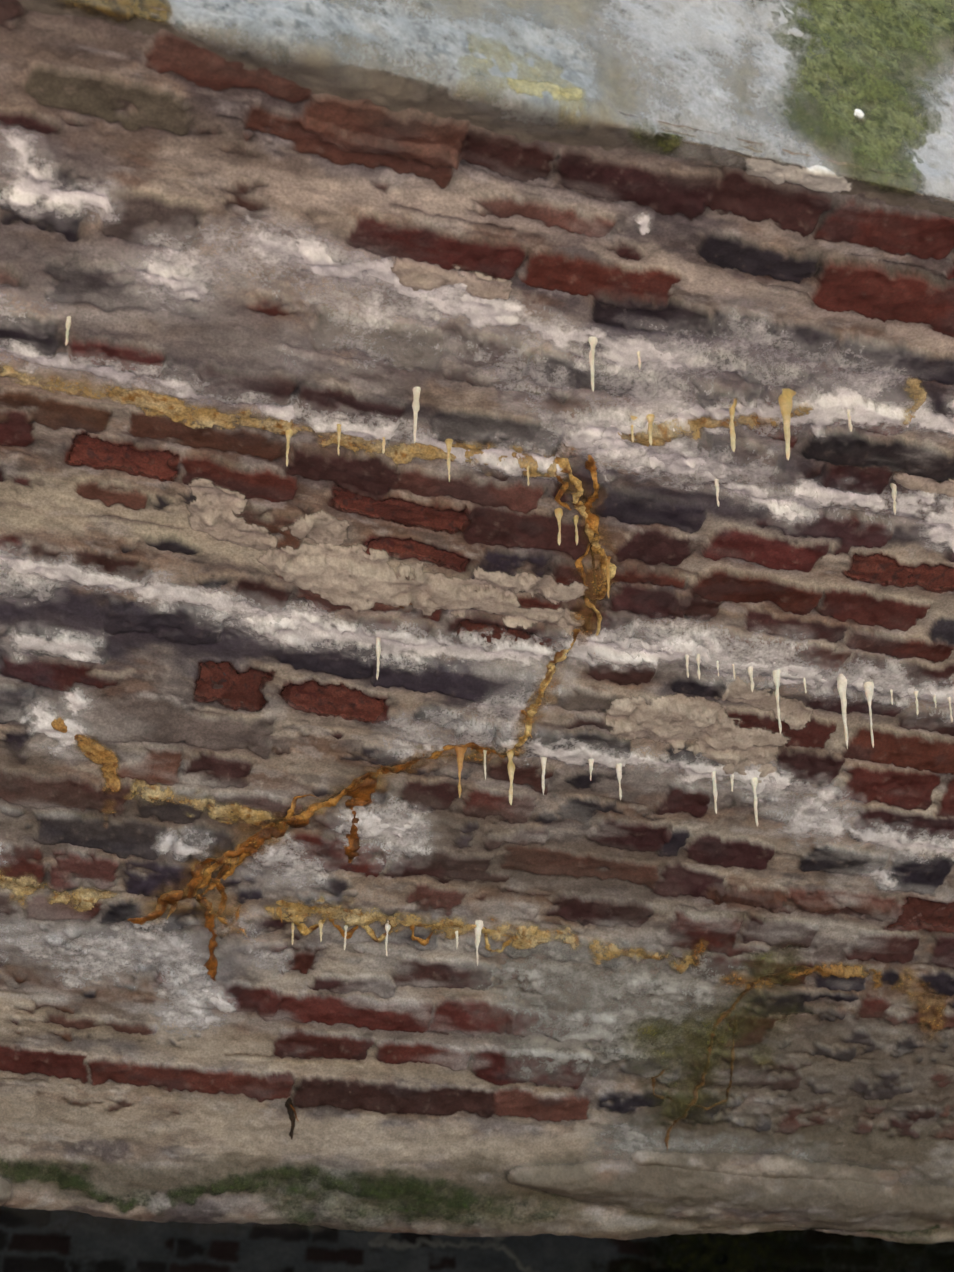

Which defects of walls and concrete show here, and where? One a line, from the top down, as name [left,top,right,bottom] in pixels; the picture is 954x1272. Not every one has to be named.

damp [0,130,116,221]
damp [0,215,954,552]
crack [127,455,616,981]
damp [0,552,954,860]
damp [251,834,328,888]
damp [863,866,897,889]
damp [0,920,236,1031]
damp [479,943,752,1079]
damp [593,1122,750,1160]